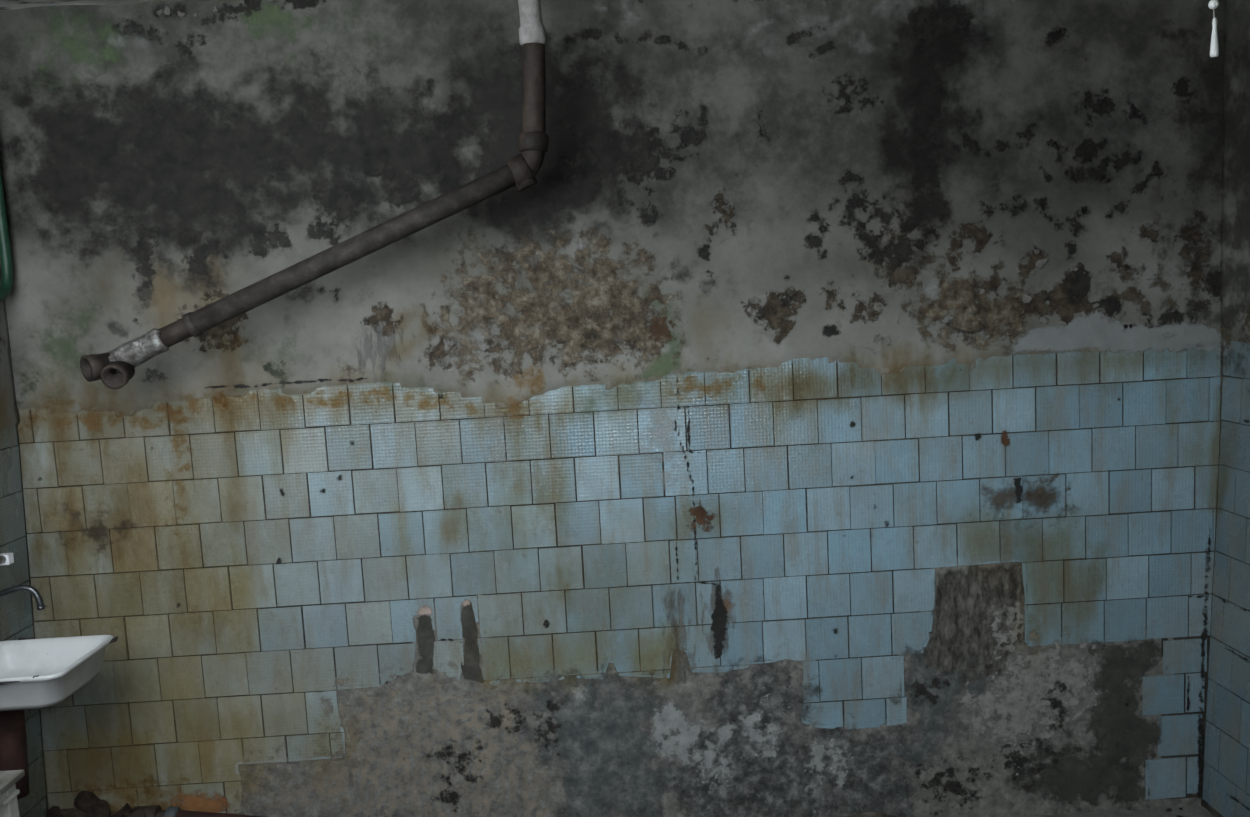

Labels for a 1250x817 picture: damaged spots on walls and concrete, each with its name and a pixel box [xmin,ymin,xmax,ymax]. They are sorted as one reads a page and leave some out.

leakage [16,44,522,301]
leakage [206,302,403,388]
leakage [418,335,458,371]
flaking render [421,230,685,381]
leakage [468,34,708,246]
leakage [698,191,736,283]
peeling [741,289,806,344]
mould [804,0,1164,337]
flaking render [901,221,1221,354]
corrosion [687,505,714,532]
crack [674,379,730,659]
spalling [226,556,1201,817]